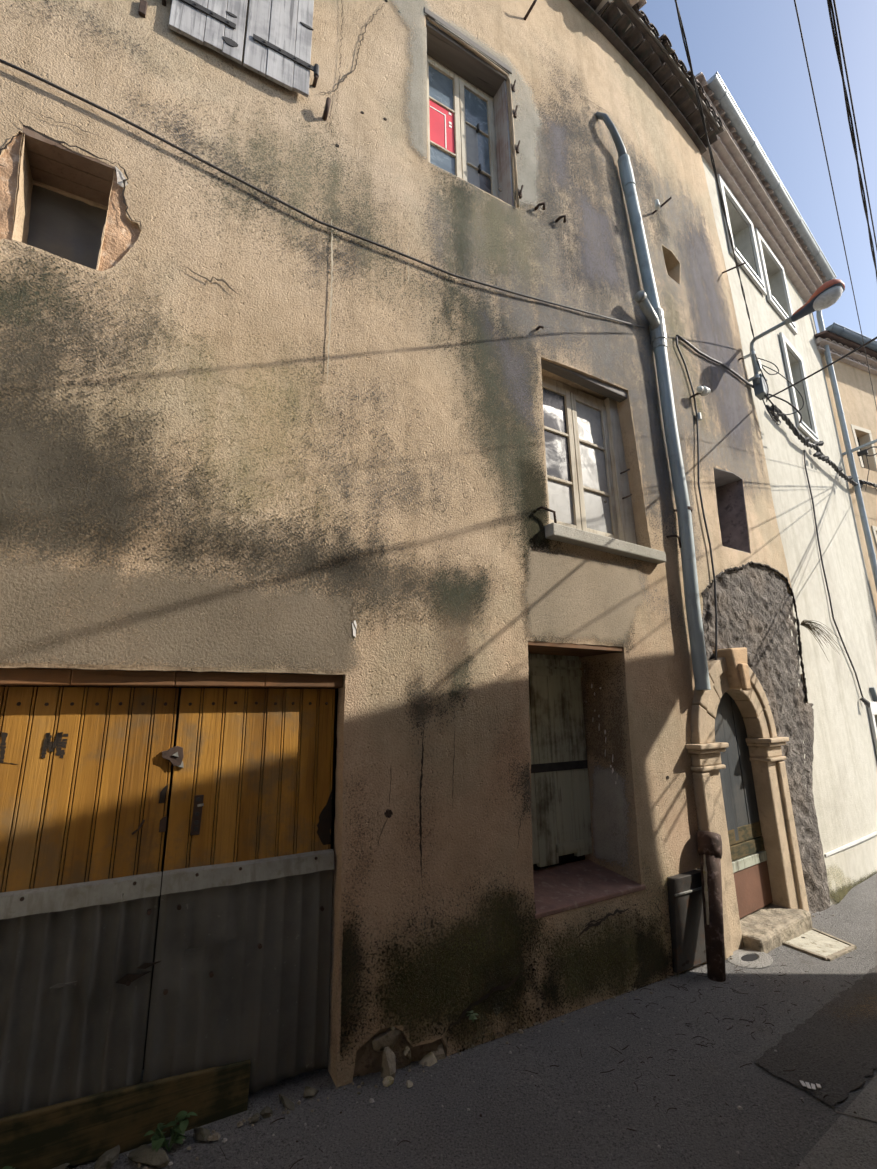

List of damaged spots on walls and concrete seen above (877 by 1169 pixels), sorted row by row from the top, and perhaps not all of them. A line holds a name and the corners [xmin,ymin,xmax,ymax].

crack [320,0,385,136]
flaking render [0,134,22,240]
flaking render [98,166,141,271]
water stain [0,0,768,742]
water stain [582,555,682,870]
flaking render [353,1026,446,1079]